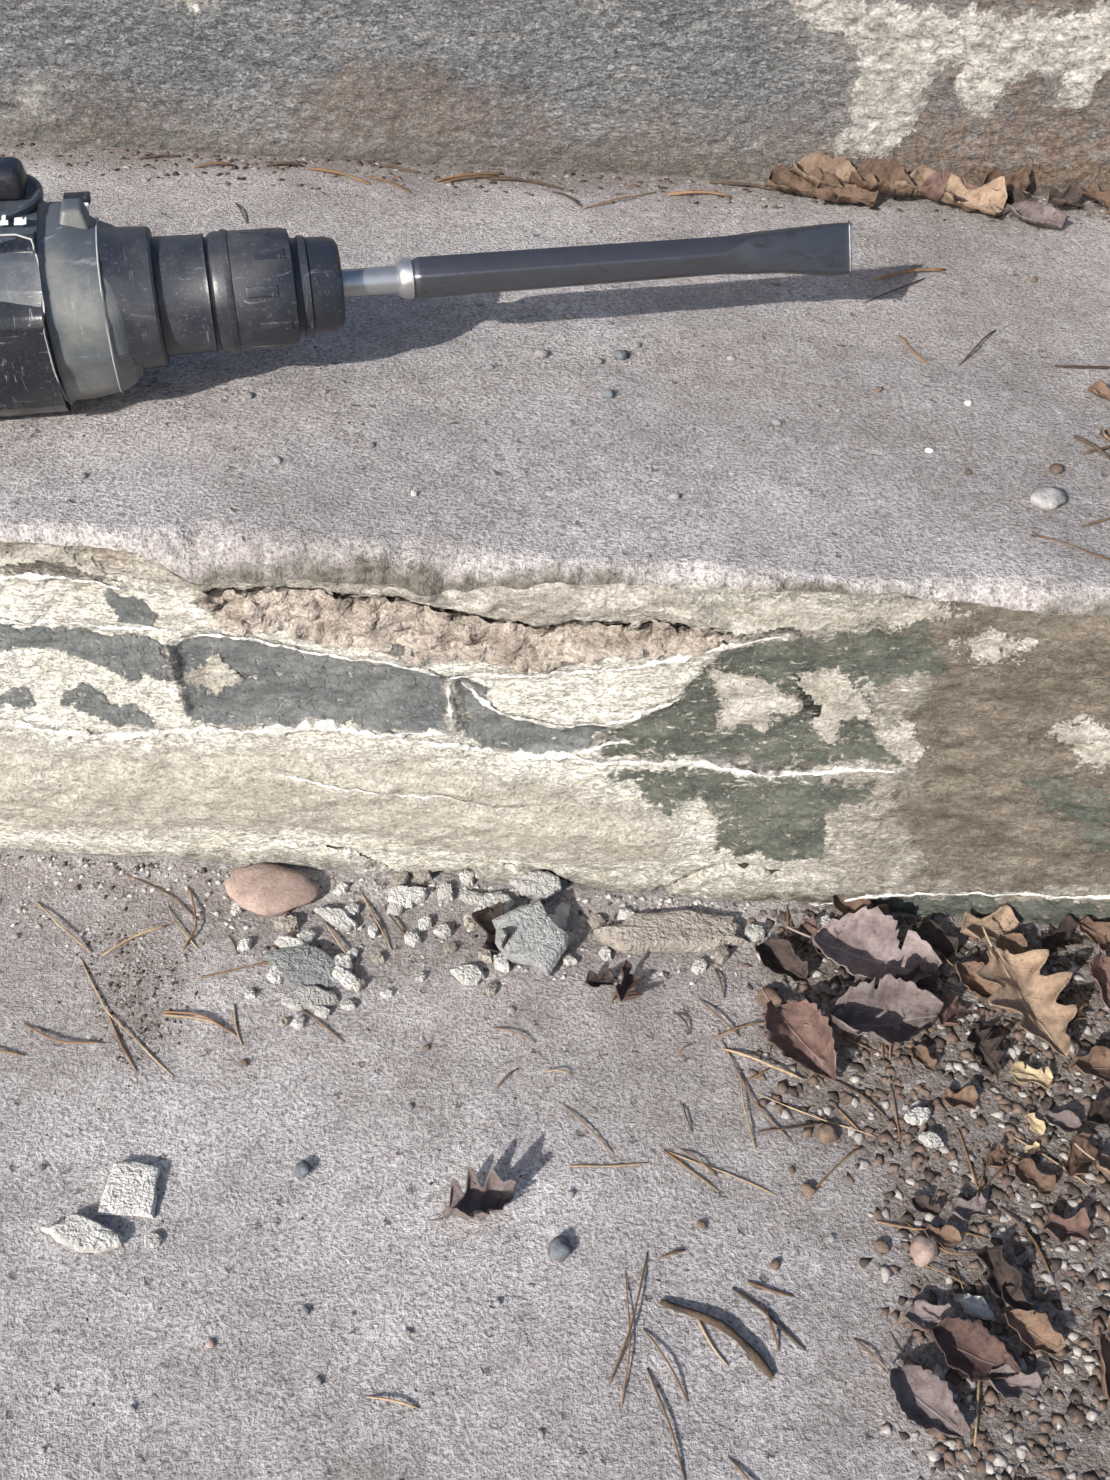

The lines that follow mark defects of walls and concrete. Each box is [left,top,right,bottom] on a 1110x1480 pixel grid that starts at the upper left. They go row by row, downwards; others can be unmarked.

peeling [0,544,1039,862]
peeling [1020,713,1110,854]